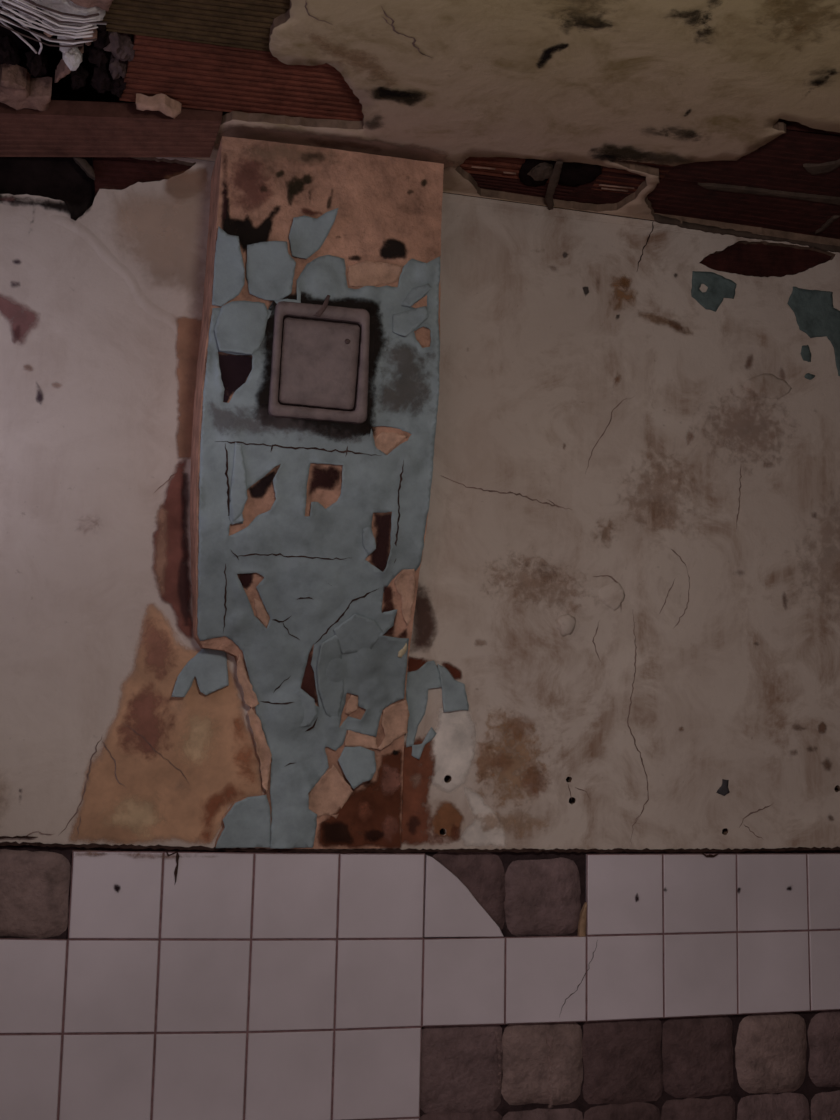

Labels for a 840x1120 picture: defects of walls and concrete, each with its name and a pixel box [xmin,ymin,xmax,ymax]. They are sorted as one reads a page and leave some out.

crack [381,6,432,58]
leakage [537,44,568,68]
mould [567,16,612,28]
mould [591,145,685,164]
peeling [171,208,469,849]
crack [440,475,572,510]
rust [407,588,435,672]
rust [442,663,461,679]
crack [0,549,840,883]
rust [319,739,463,848]
peeling [423,852,581,938]
peeling [420,1010,840,1120]